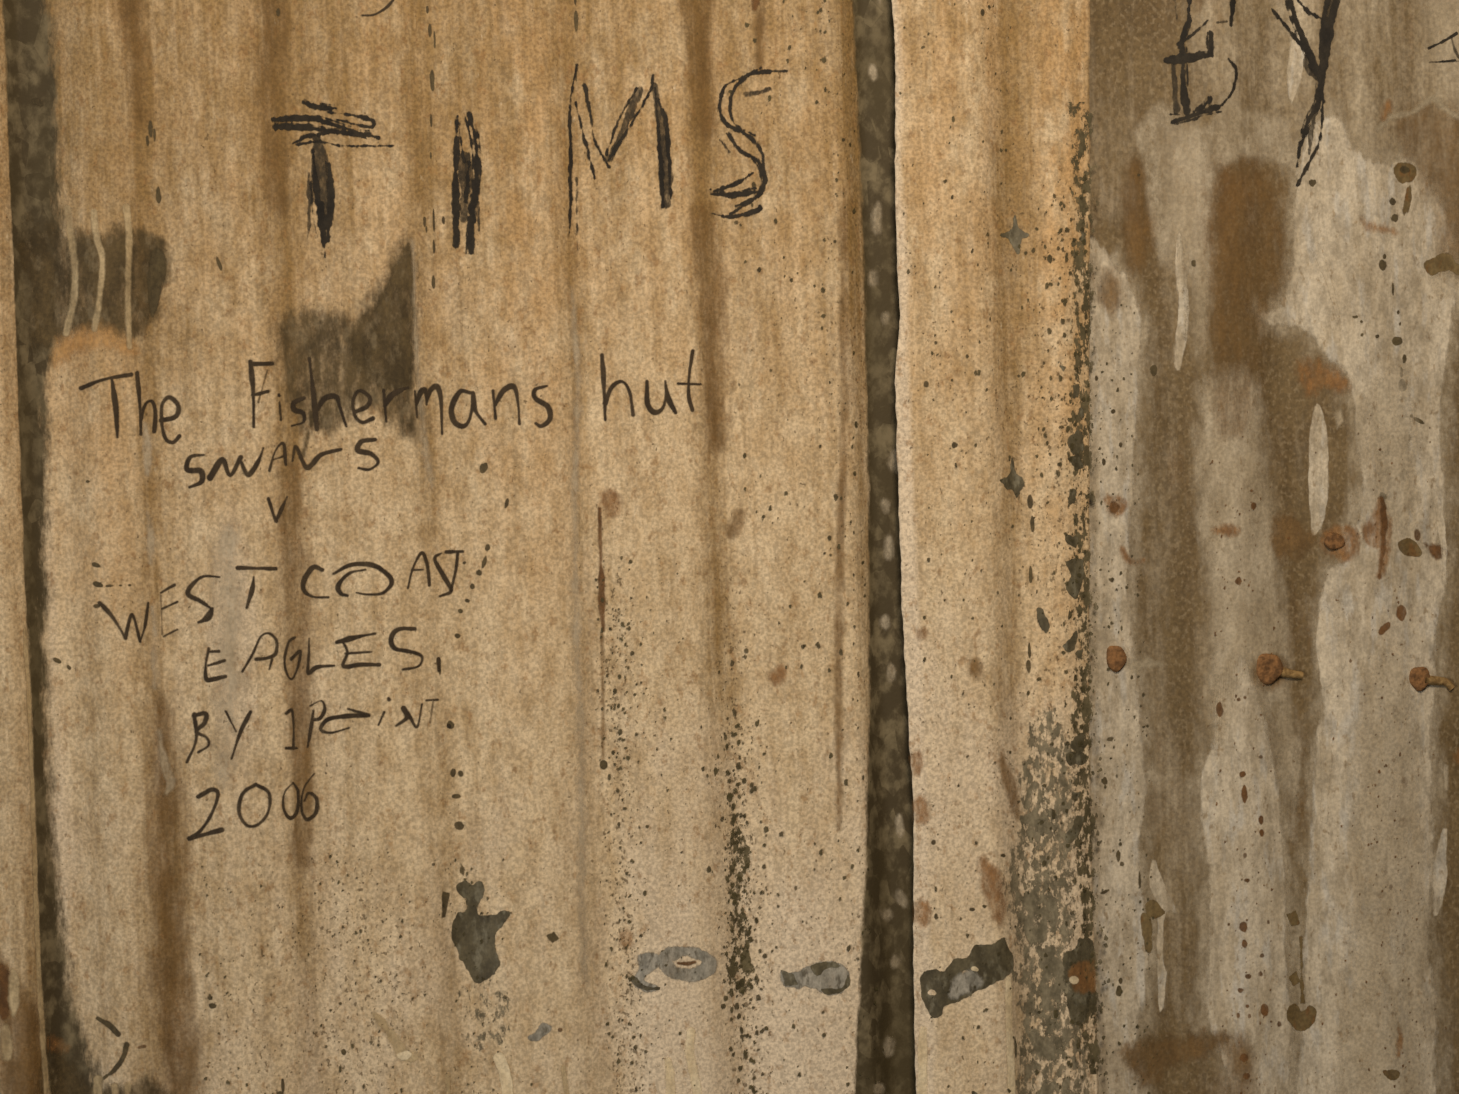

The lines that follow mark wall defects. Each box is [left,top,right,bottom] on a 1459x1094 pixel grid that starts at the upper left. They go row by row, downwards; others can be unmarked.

peeling [920,102,1459,1094]
rust [1272,497,1448,579]
damp [168,945,256,1094]
damp [305,854,512,1091]
peeling [442,865,510,1050]
peeling [631,946,717,992]
peeling [780,961,850,995]